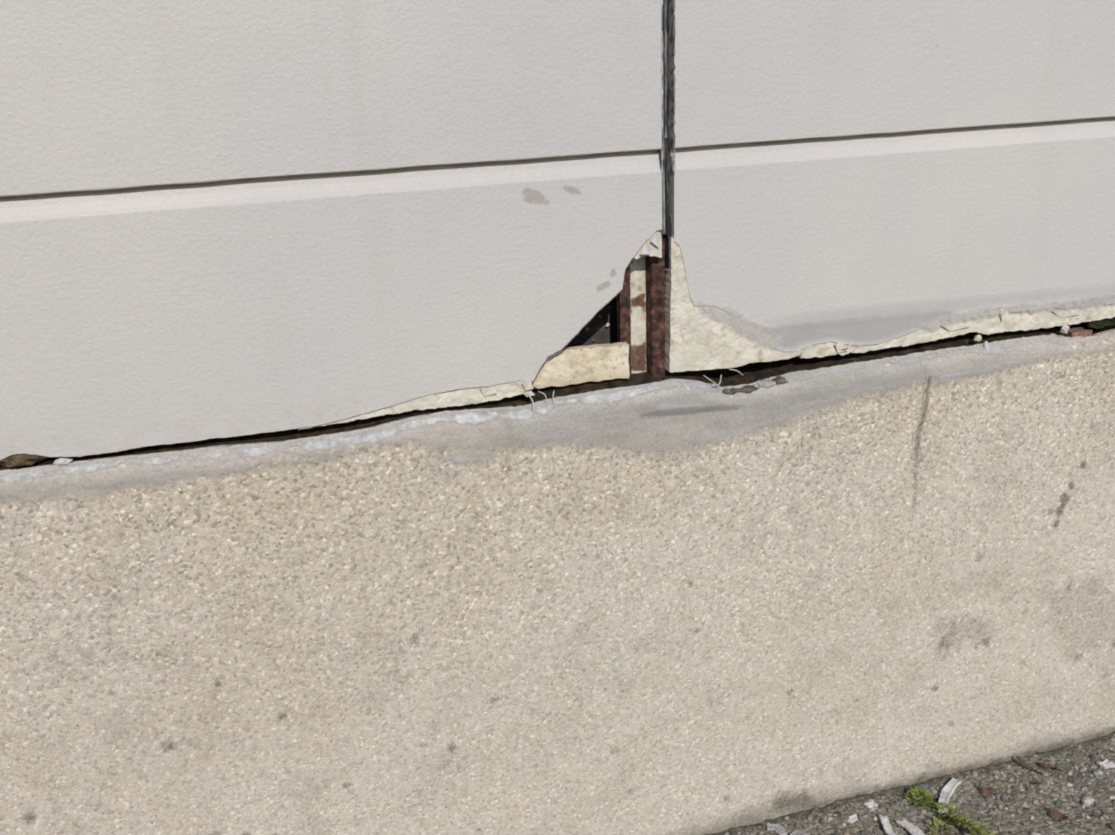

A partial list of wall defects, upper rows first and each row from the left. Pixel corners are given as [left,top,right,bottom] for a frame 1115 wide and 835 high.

rust [631,294,646,312]
peeling [298,230,1115,430]
rust [631,343,646,371]